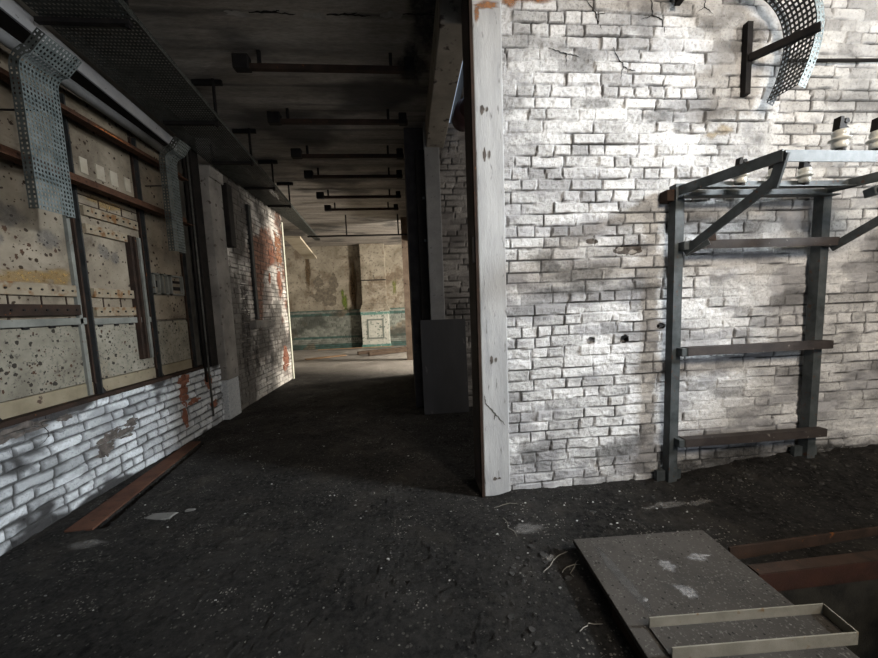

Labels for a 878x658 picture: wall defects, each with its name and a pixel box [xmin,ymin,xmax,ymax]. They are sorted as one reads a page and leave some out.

rust [475,0,547,20]
peeling [268,230,283,290]
peeling [89,417,138,458]